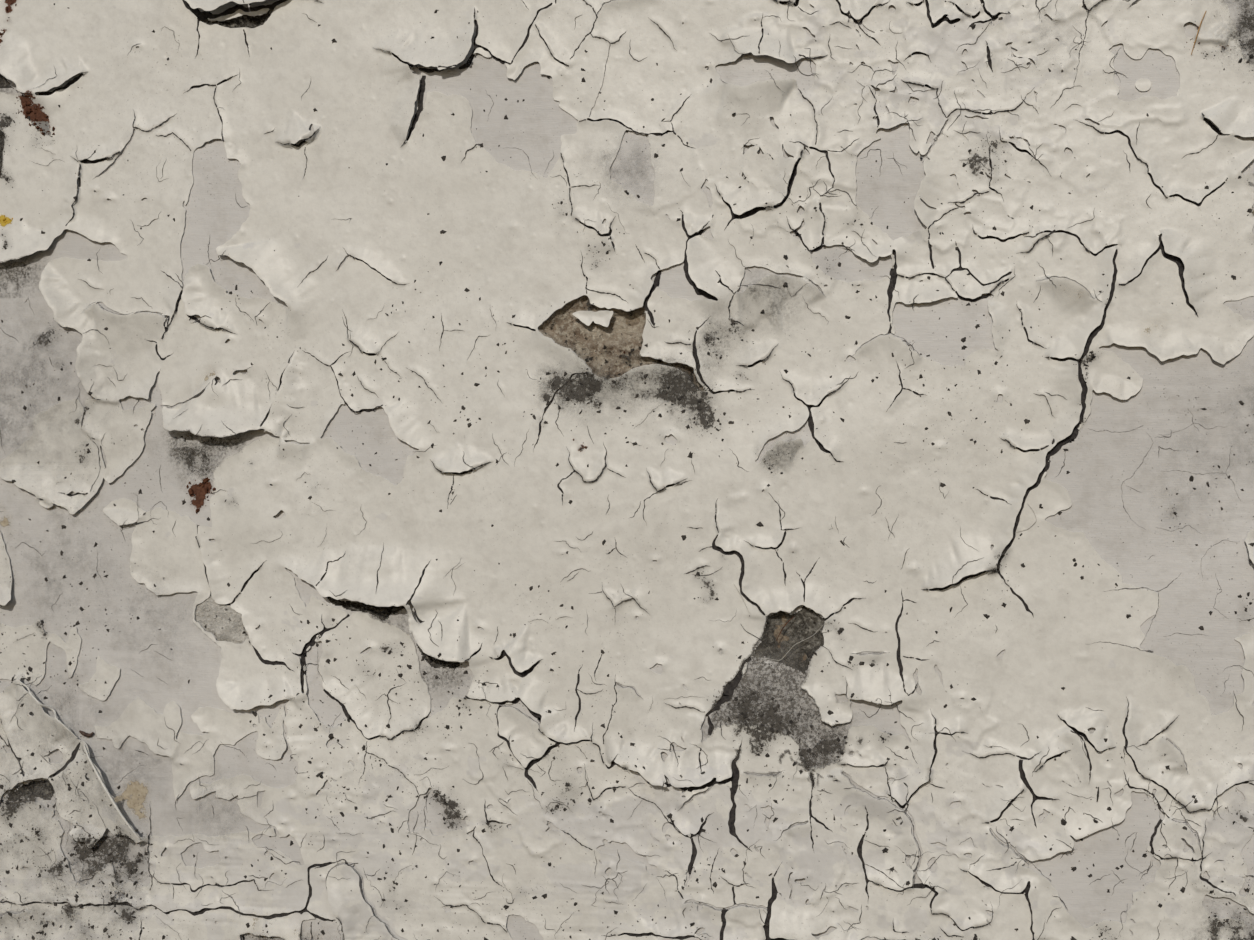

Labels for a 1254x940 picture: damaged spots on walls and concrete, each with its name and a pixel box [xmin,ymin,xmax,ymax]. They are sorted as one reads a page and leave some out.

corrosion [16,90,55,138]
crack [32,0,324,226]
crack [69,240,695,526]
crack [374,0,693,148]
crack [517,148,622,252]
peeling [572,310,613,327]
crack [680,70,902,326]
crack [779,0,1107,462]
crack [1077,112,1228,207]
corrosion [186,477,216,514]
crack [195,208,1254,940]
peeling [692,582,928,781]